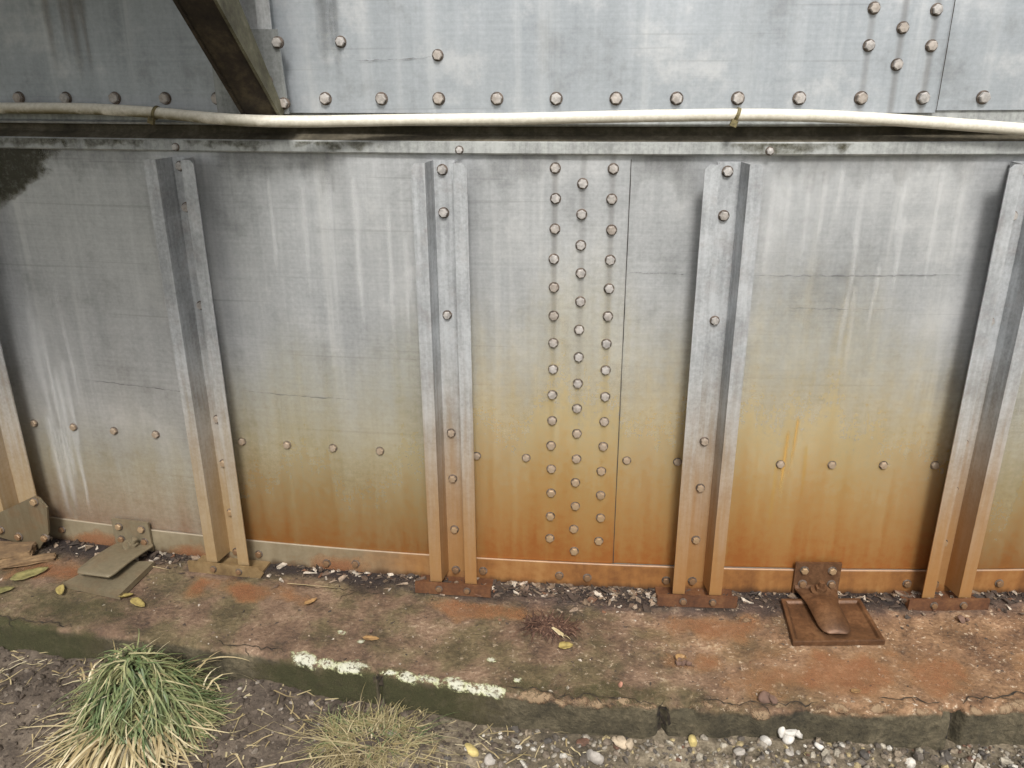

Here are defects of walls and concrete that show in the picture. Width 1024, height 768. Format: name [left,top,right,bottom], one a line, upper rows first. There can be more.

leakage [0,148,56,202]
corrosion [239,439,429,554]
corrosion [474,392,685,565]
corrosion [724,414,947,569]
corrosion [977,480,1024,569]
crack [880,691,1024,739]